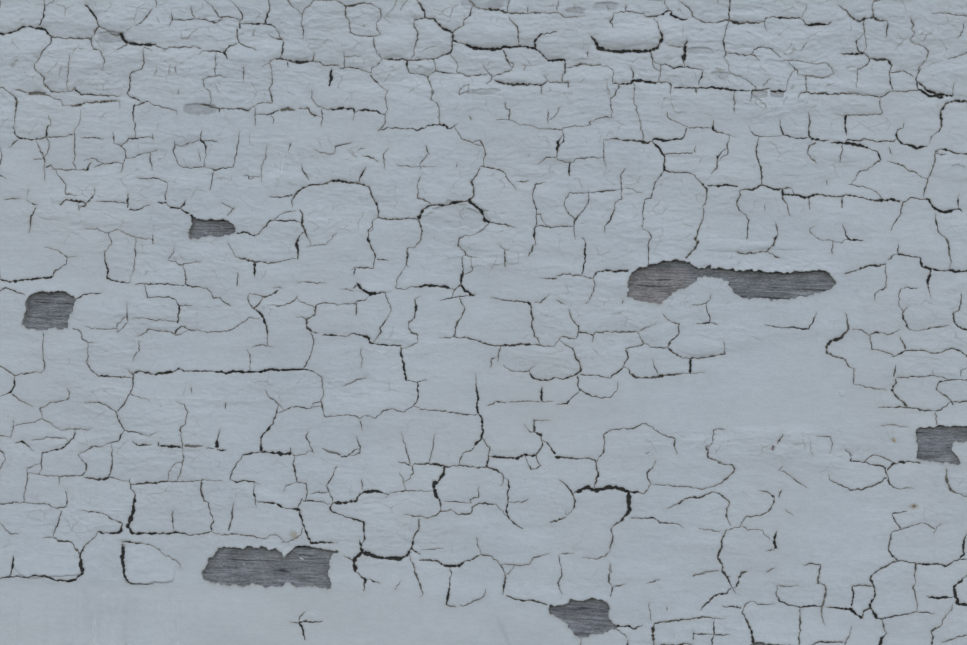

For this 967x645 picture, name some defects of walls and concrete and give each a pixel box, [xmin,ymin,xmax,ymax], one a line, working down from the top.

peeling [188,215,235,239]
crack [0,0,967,425]
peeling [627,259,836,304]
peeling [22,291,76,331]
crack [819,436,920,491]
peeling [915,425,967,465]
crack [945,469,967,497]
peeling [201,545,338,589]
peeling [548,598,617,638]